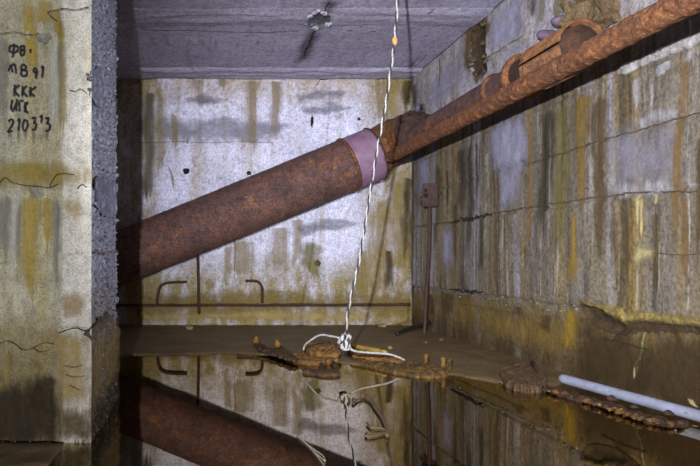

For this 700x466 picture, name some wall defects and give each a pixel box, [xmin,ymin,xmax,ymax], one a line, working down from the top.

spalling [307,9,332,31]
spalling [430,6,516,102]
water stain [141,93,154,198]
crack [0,173,87,189]
water stain [592,100,669,253]
crack [416,190,697,227]
water stain [300,221,345,235]
water stain [626,214,658,282]
crack [0,316,102,353]
spalling [559,301,700,335]
water stain [582,301,700,325]
water stain [0,327,120,443]